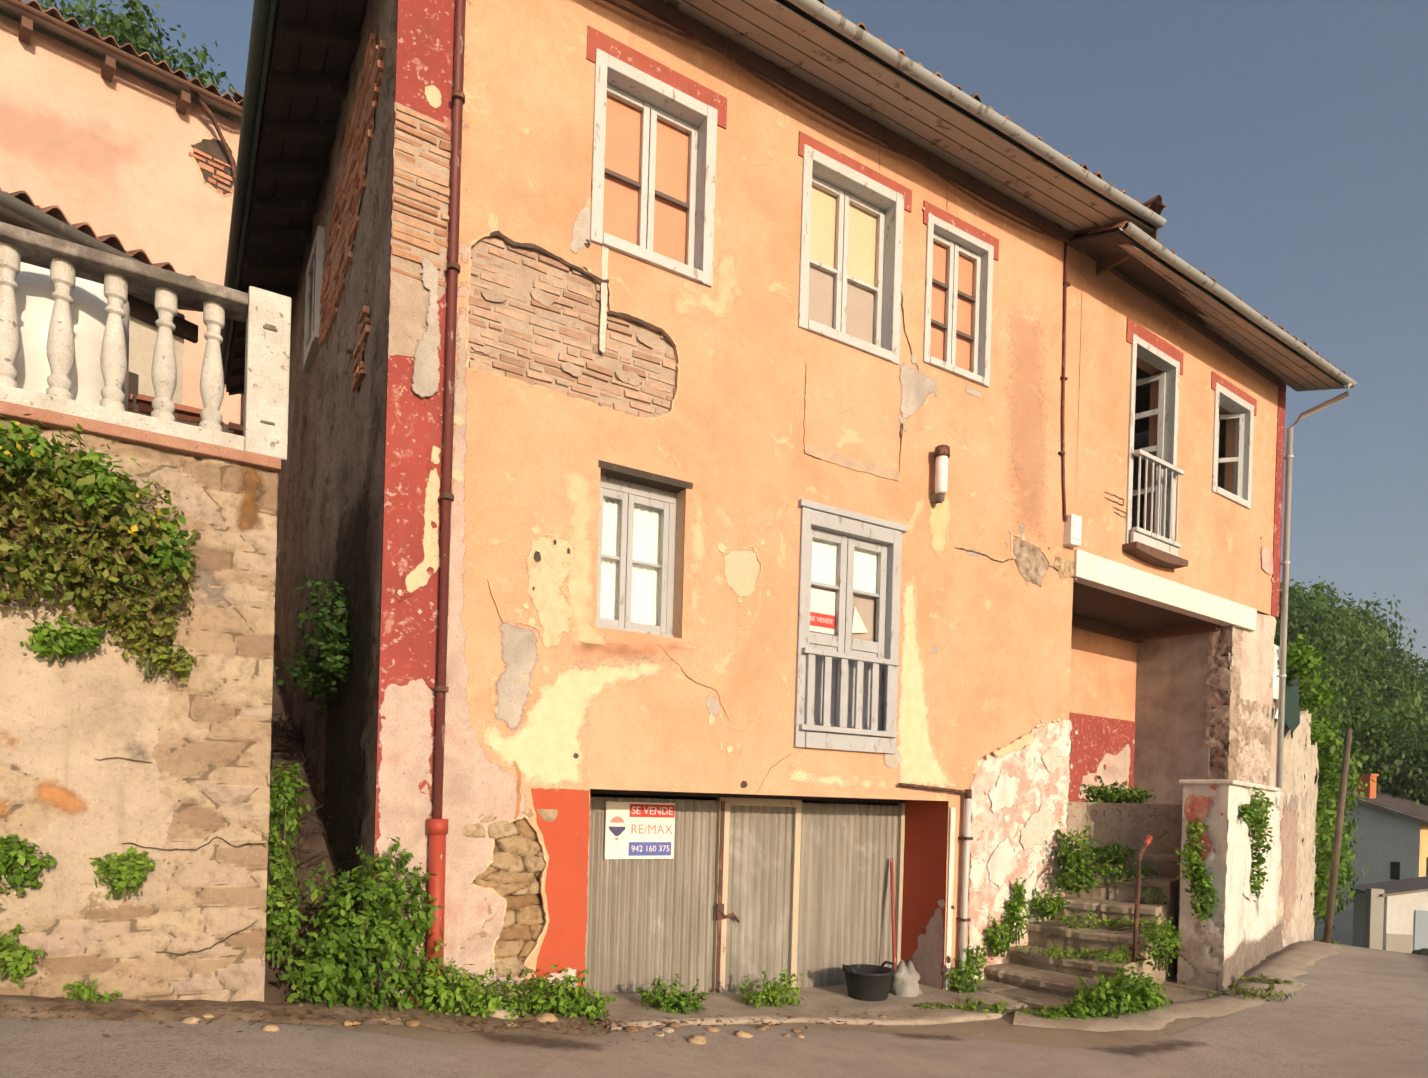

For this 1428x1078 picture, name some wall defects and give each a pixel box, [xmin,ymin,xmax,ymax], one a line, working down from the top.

spalling [189,136,235,198]
peeling [674,254,739,317]
peeling [898,354,940,432]
spalling [318,32,680,1002]
peeling [717,508,784,616]
crack [954,547,1013,563]
damp [323,491,371,925]
crack [657,644,729,720]
peeling [789,578,1135,989]
peeling [1184,784,1224,861]